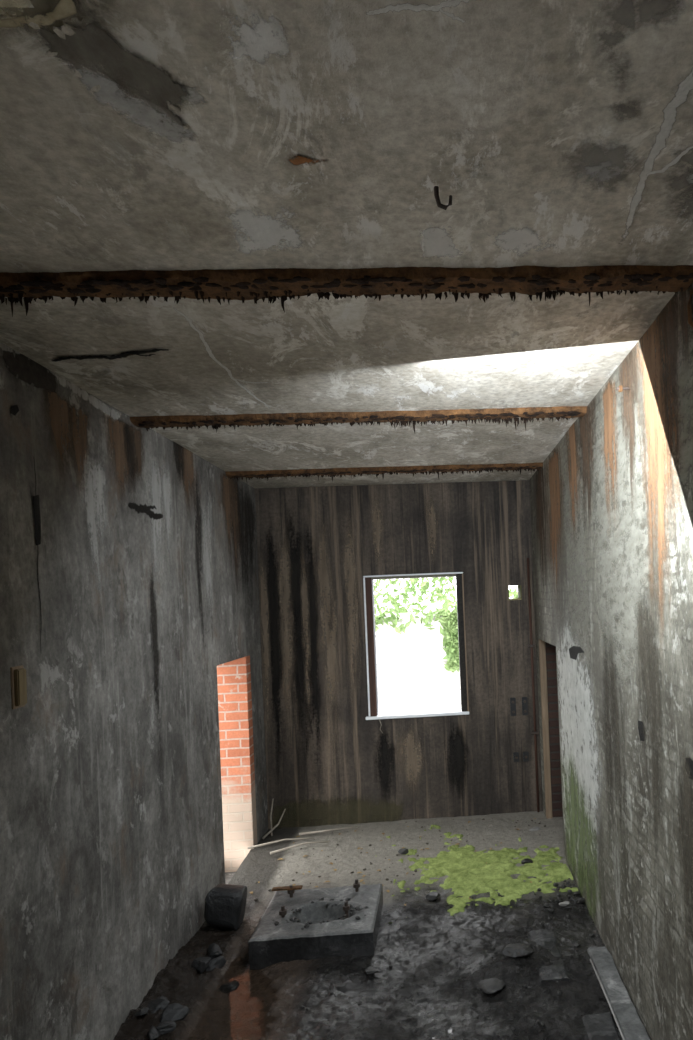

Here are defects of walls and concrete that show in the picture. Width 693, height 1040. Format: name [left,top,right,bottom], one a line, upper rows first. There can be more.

spalling [23,22,205,142]
leakage [600,0,682,80]
crack [623,69,693,238]
crack [52,349,168,362]
leakage [235,488,358,757]
leakage [375,731,423,796]
leakage [447,728,468,793]
leakage [604,647,624,828]
leakage [638,603,661,814]
leakage [677,758,693,937]